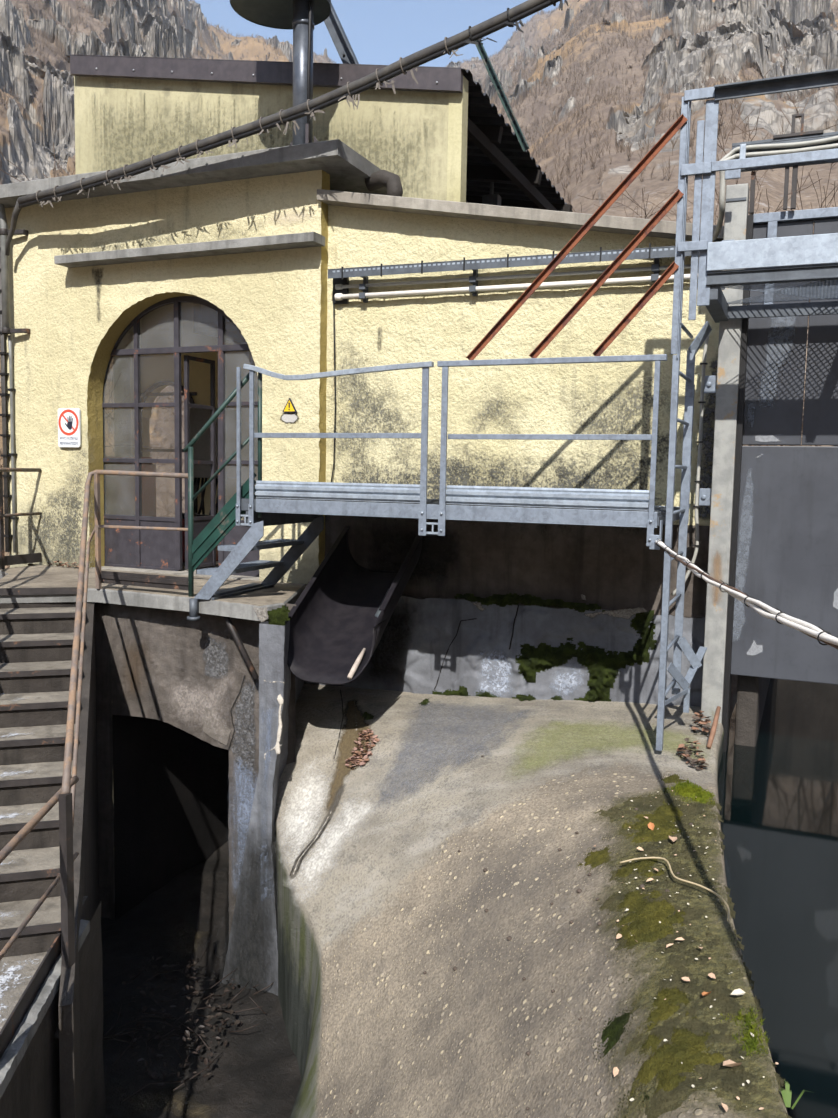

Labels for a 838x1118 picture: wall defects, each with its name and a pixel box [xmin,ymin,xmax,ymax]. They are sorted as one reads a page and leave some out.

water stain [338,363,668,506]
peeling [733,316,795,641]
crack [434,618,477,690]
crack [509,605,519,650]
water stain [552,668,581,694]
peeling [747,640,763,656]
water stain [264,694,283,770]
water stain [219,761,371,993]